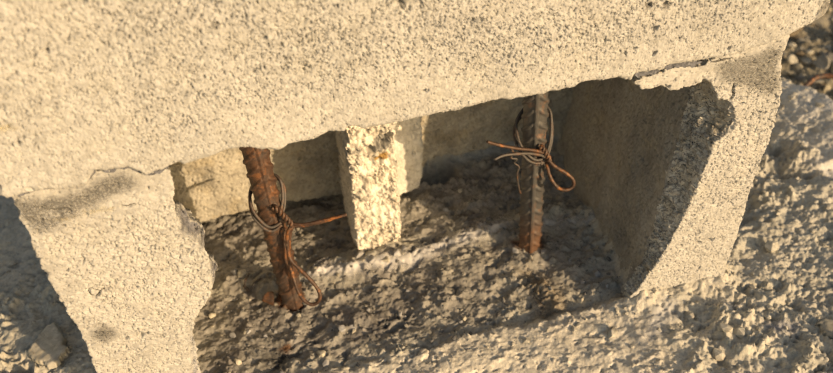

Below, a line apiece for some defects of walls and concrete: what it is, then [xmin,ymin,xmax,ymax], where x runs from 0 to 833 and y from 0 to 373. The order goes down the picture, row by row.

crack [633,57,733,78]
spalling [354,134,392,155]
spalling [518,92,550,254]
spalling [178,207,205,244]
spalling [239,147,305,311]